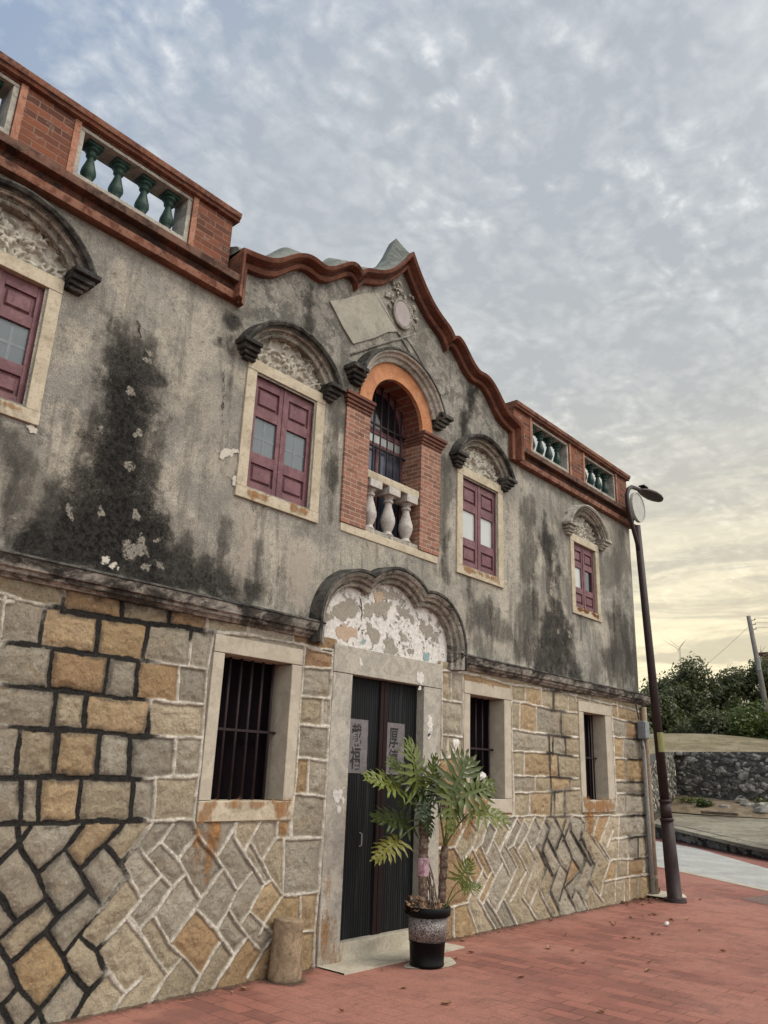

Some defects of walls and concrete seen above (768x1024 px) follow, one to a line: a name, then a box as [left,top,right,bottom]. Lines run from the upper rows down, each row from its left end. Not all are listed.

damp [217,312,242,354]
damp [0,319,272,602]
flaking render [220,447,239,486]
flaking render [101,534,164,571]
damp [286,455,582,680]
damp [574,509,605,541]
peeling [324,584,447,690]
damp [602,600,638,686]
rust [192,798,291,881]